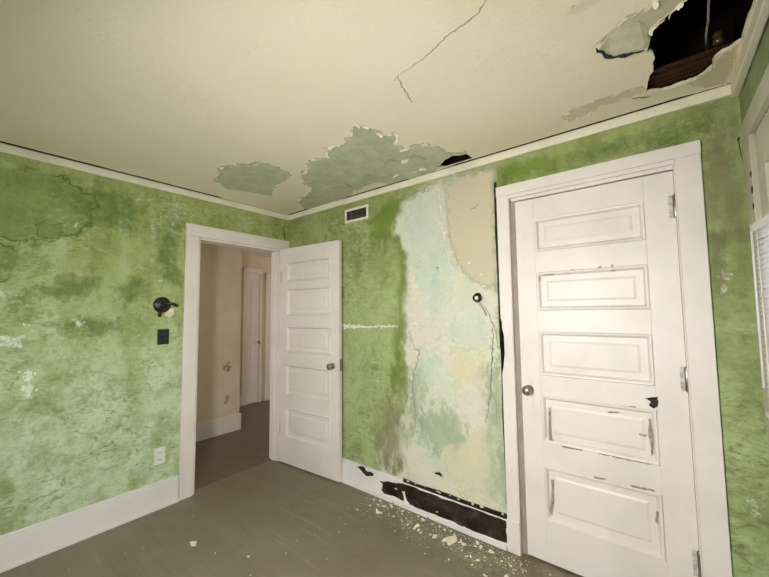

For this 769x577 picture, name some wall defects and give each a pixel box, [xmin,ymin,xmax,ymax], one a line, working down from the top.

crack [394,0,486,103]
leakage [53,174,135,238]
spalling [0,141,221,198]
peeling [214,0,755,577]
peeling [0,323,34,352]
peeling [15,369,38,399]
crack [405,332,423,429]
crack [483,306,498,422]